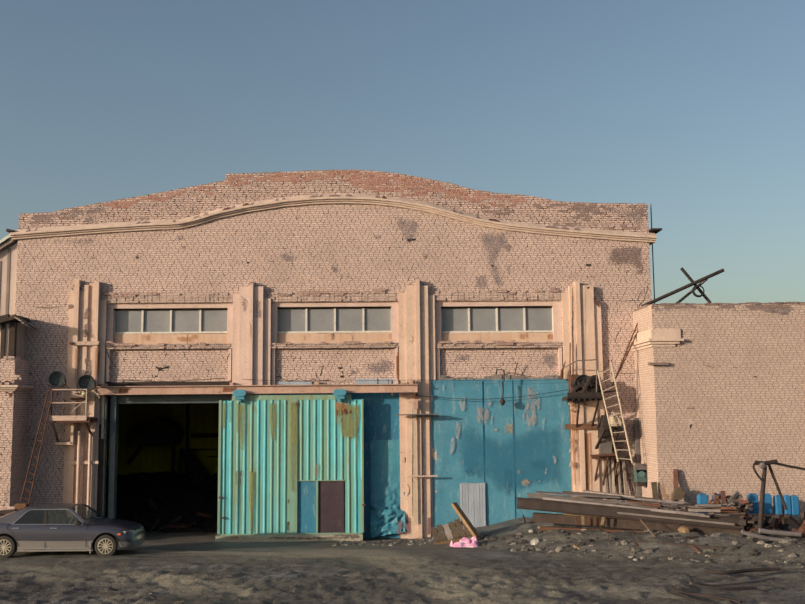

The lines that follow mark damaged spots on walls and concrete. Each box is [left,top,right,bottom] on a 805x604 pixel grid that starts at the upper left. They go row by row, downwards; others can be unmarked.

peeling [31,208,94,224]
peeling [103,186,216,208]
peeling [226,170,615,230]
peeling [628,205,647,216]
water stain [476,233,509,289]
water stain [609,246,643,273]
corrosion [269,403,297,491]
corrosion [335,403,359,447]
peeling [476,401,513,432]
peeling [514,386,545,430]